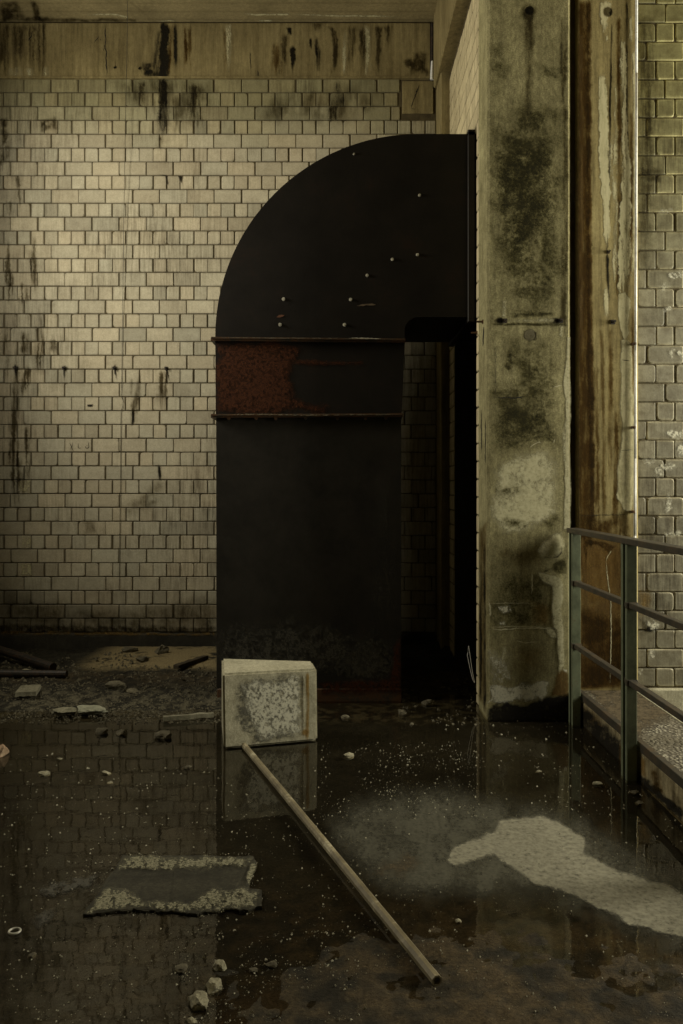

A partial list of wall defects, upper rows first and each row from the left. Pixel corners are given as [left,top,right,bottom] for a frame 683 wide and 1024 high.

water stain [1,2,47,70]
water stain [140,20,191,140]
water stain [274,28,296,69]
water stain [305,14,389,70]
water stain [523,7,535,48]
water stain [497,49,571,529]
rust [216,342,327,413]
rust [576,2,629,688]